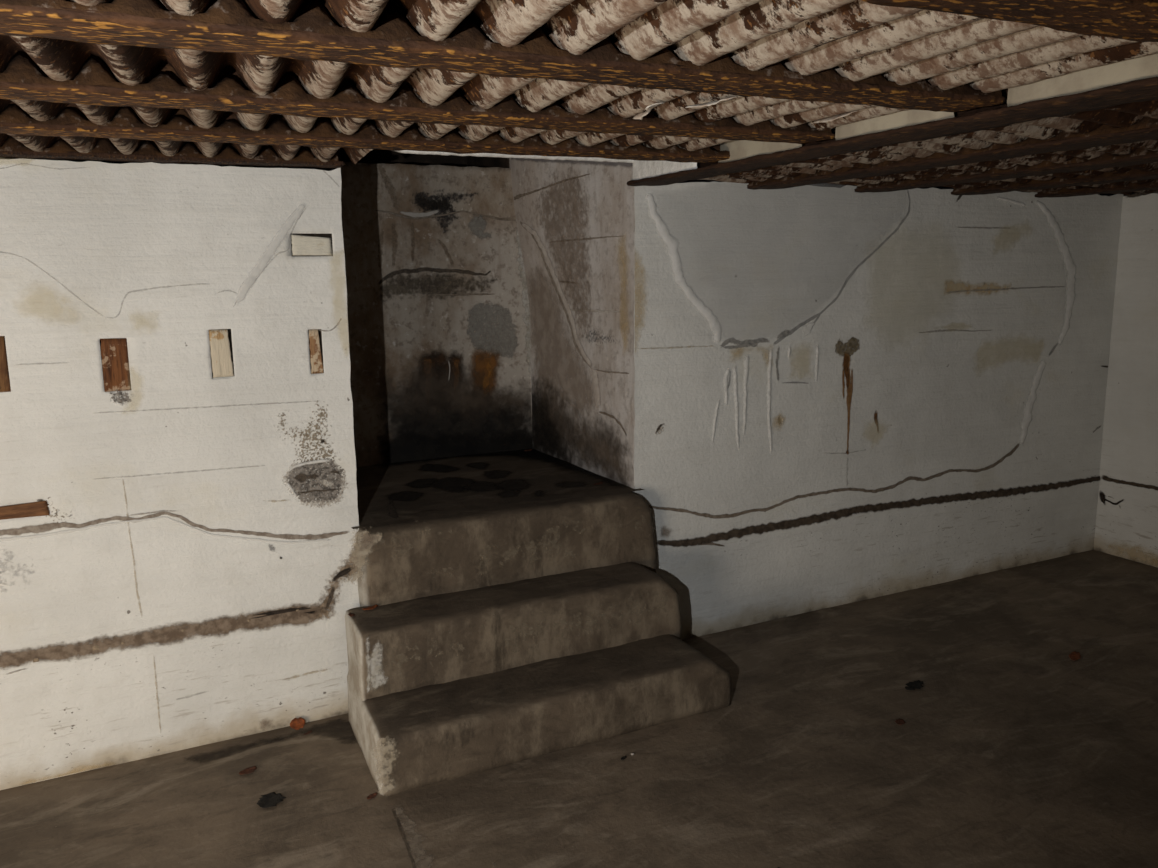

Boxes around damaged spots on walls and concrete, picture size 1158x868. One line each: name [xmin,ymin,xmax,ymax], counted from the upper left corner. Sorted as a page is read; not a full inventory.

leakage [415,190,478,264]
leakage [382,368,627,501]
corrosion [835,337,860,454]
crack [0,510,347,543]
crack [649,444,1158,547]
crack [0,604,323,668]